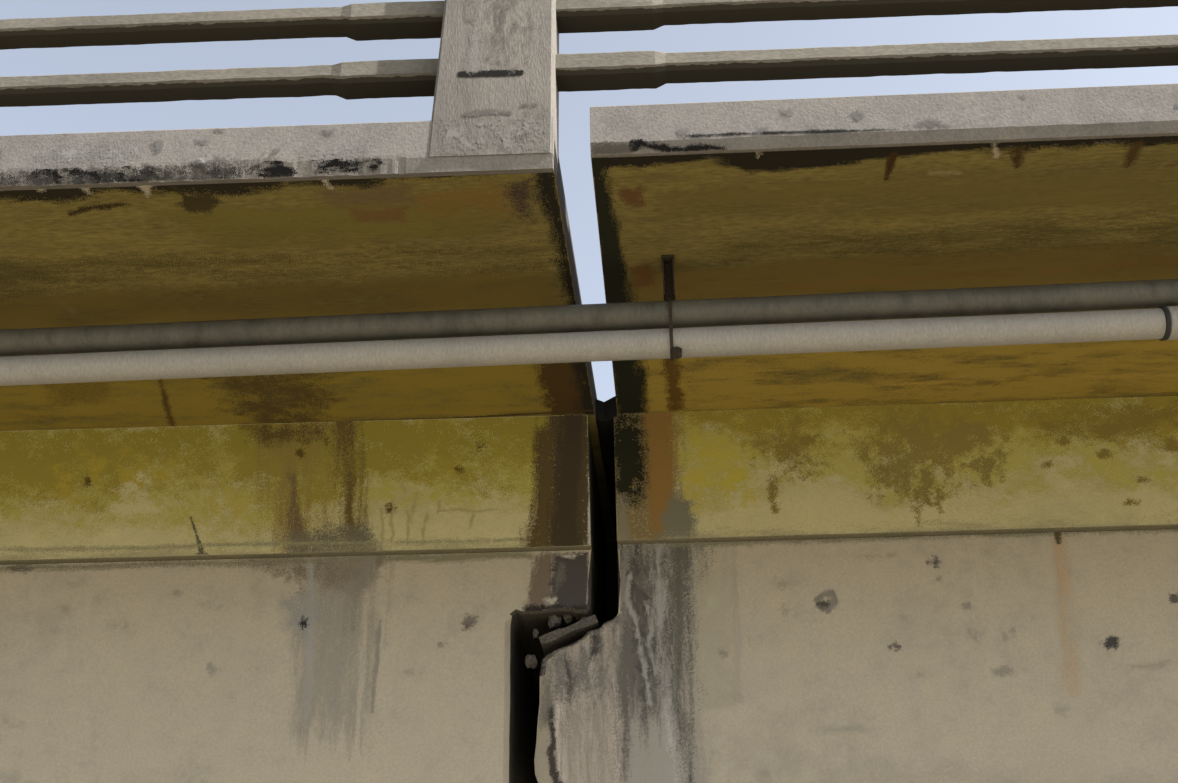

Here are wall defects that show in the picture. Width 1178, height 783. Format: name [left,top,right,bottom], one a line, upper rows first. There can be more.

water stain [0,362,594,765]
water stain [538,339,1178,783]